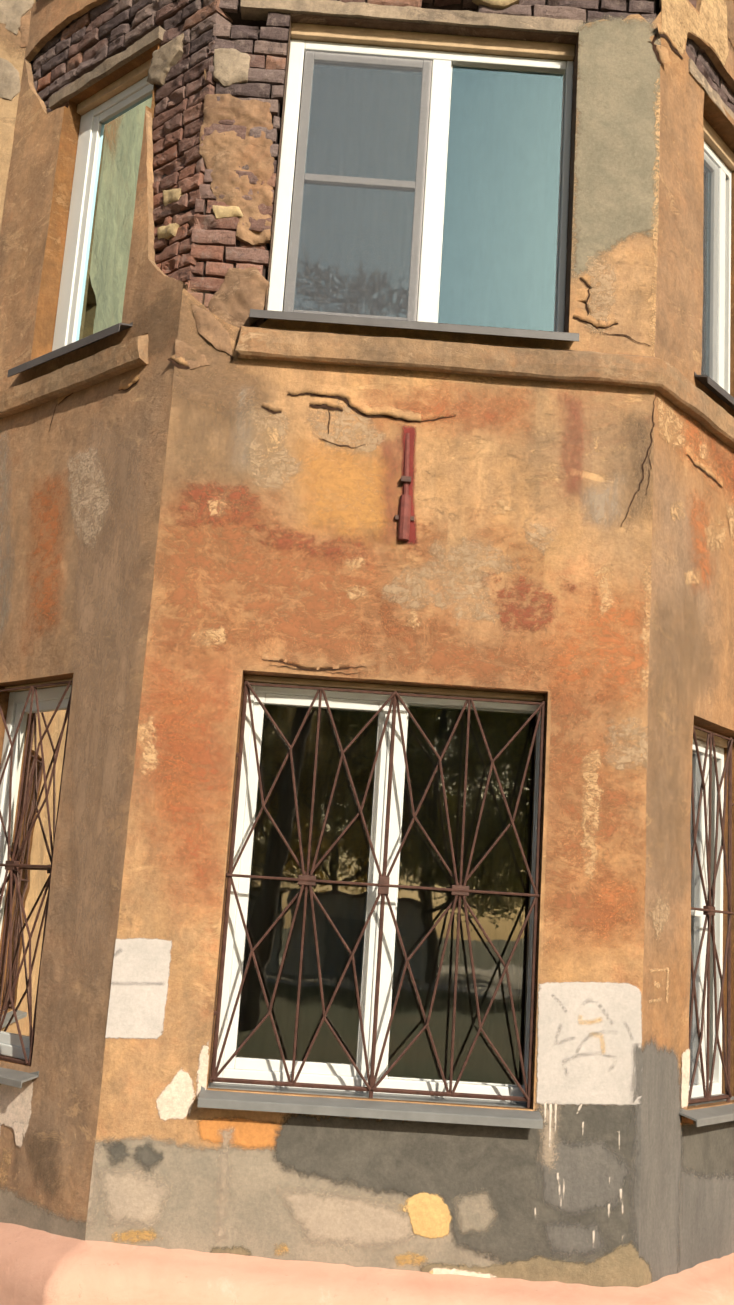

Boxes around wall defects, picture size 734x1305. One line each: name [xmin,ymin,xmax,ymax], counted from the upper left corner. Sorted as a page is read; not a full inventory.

spalling [331,0,734,113]
spalling [0,0,291,328]
crack [573,273,650,346]
crack [261,382,456,448]
crack [621,394,656,527]
crack [686,446,723,488]